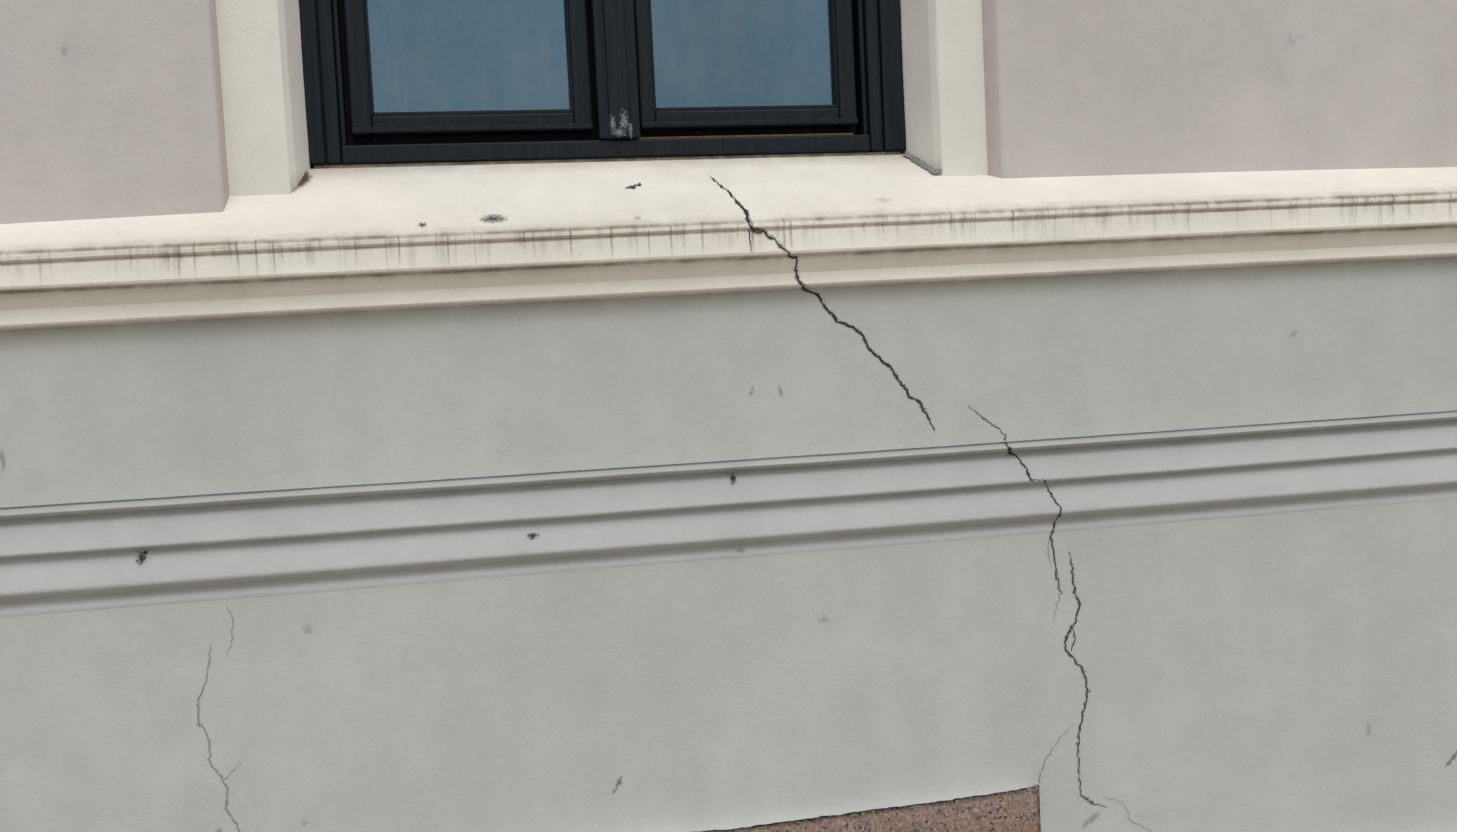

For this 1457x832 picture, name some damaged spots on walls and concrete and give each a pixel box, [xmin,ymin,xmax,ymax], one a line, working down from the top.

crack [709,175,935,430]
crack [968,405,1105,807]